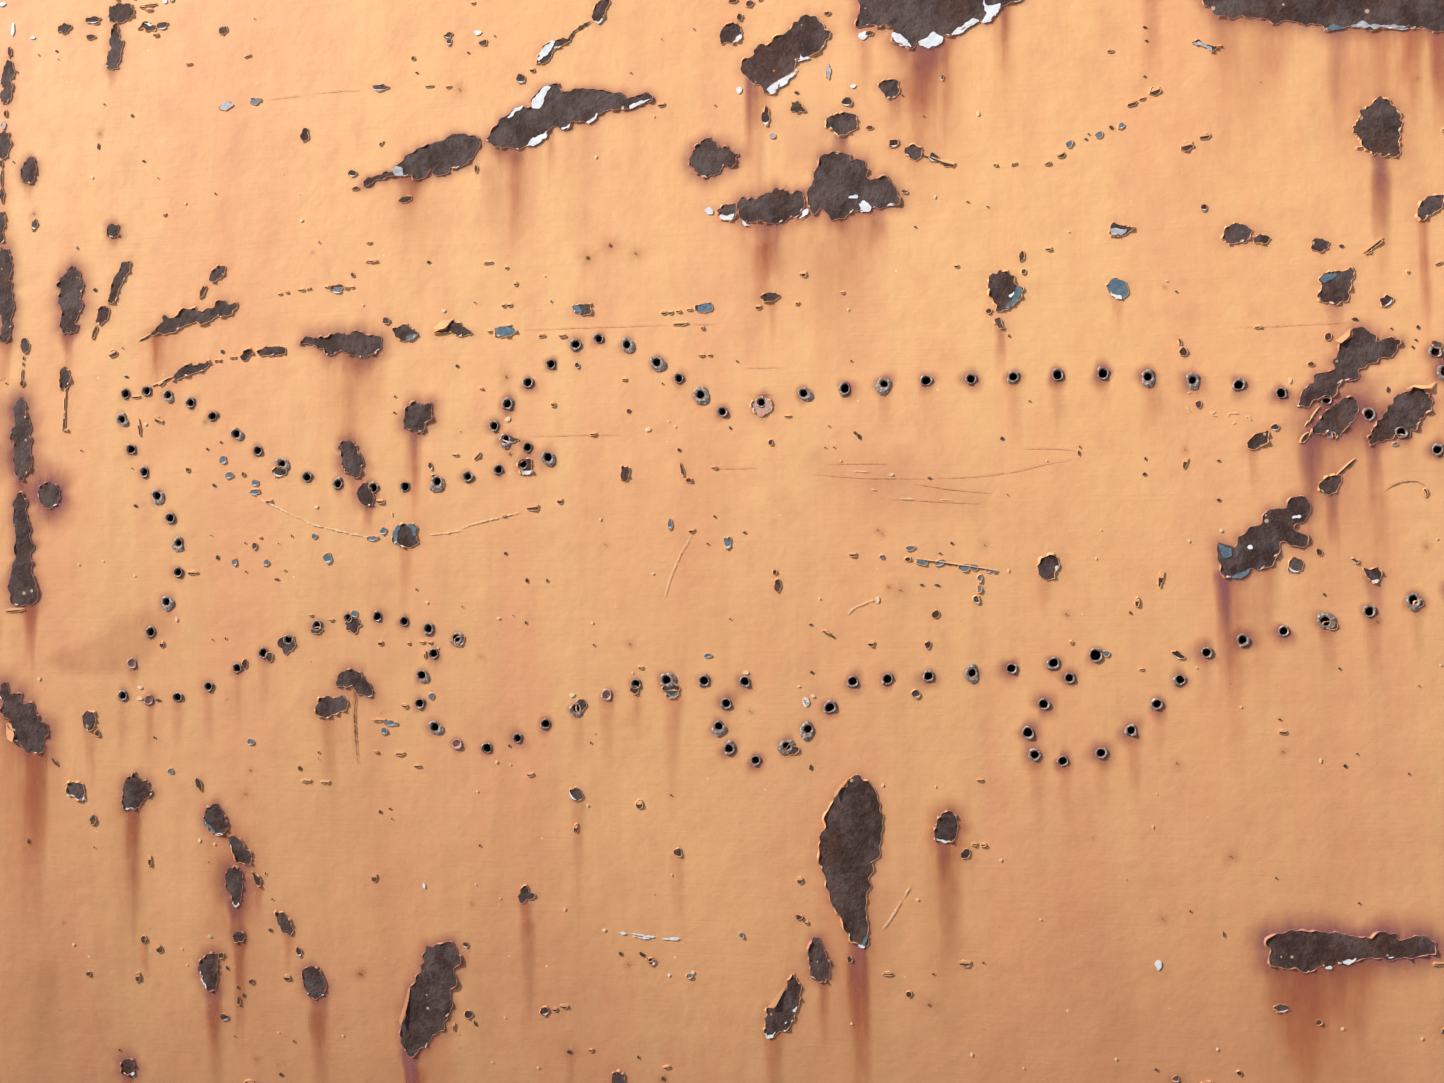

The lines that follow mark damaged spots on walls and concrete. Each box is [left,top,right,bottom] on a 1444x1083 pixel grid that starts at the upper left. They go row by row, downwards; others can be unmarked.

peeling [853,0,1023,51]
peeling [1192,39,1222,54]
peeling [1201,0,1444,34]
peeling [348,36,665,203]
peeling [0,0,174,612]
peeling [1297,317,1442,447]
peeling [1216,473,1342,580]
peeling [0,682,59,766]
peeling [398,940,477,1058]
peeling [763,774,884,1039]
peeling [1264,929,1444,974]